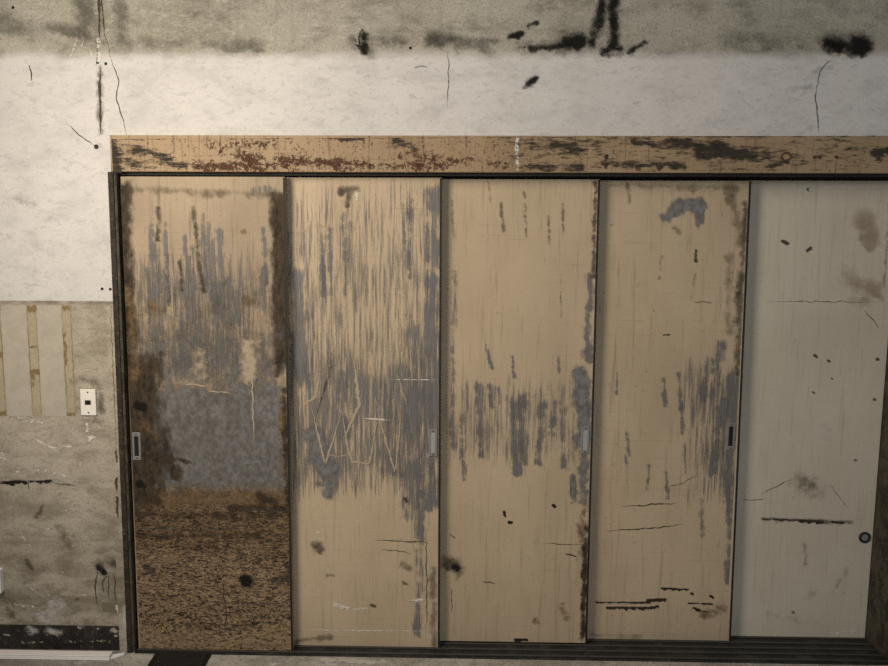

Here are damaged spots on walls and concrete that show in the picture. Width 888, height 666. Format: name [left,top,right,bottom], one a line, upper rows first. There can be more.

crack [68,0,127,146]
corrosion [111,137,531,173]
leakage [588,0,623,56]
crack [815,60,830,132]
corrosion [120,182,291,651]
corrosion [545,511,588,639]